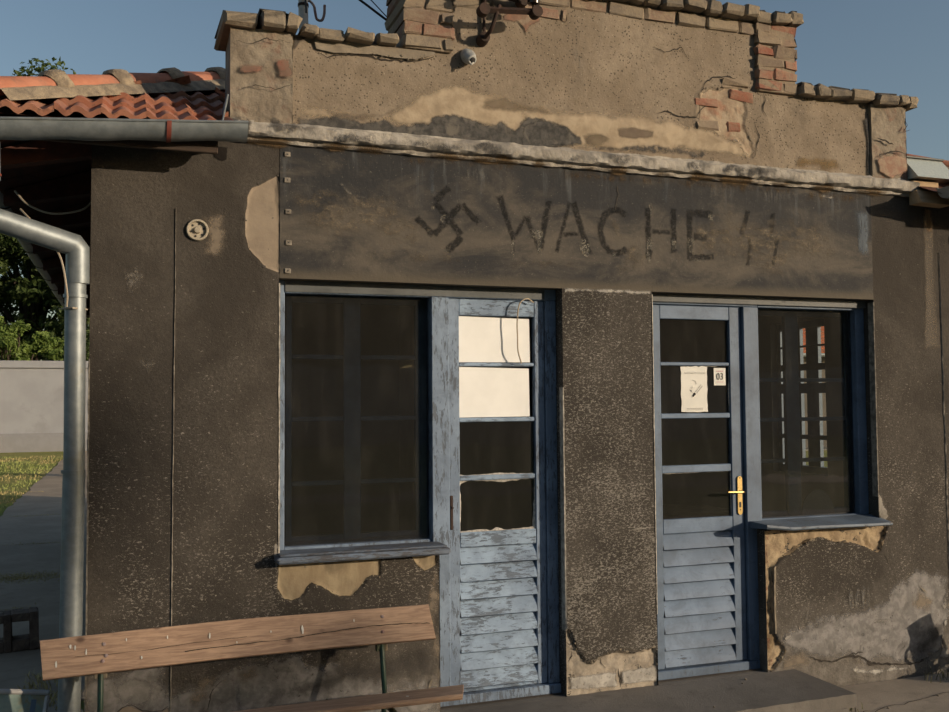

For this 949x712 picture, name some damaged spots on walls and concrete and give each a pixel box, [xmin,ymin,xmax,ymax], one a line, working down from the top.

crack [316,50,433,63]
crack [660,76,767,157]
spalling [694,78,754,157]
spalling [243,175,381,602]
spalling [763,302,888,672]
spalling [412,555,436,570]
damp [785,571,949,674]
crack [809,652,928,668]